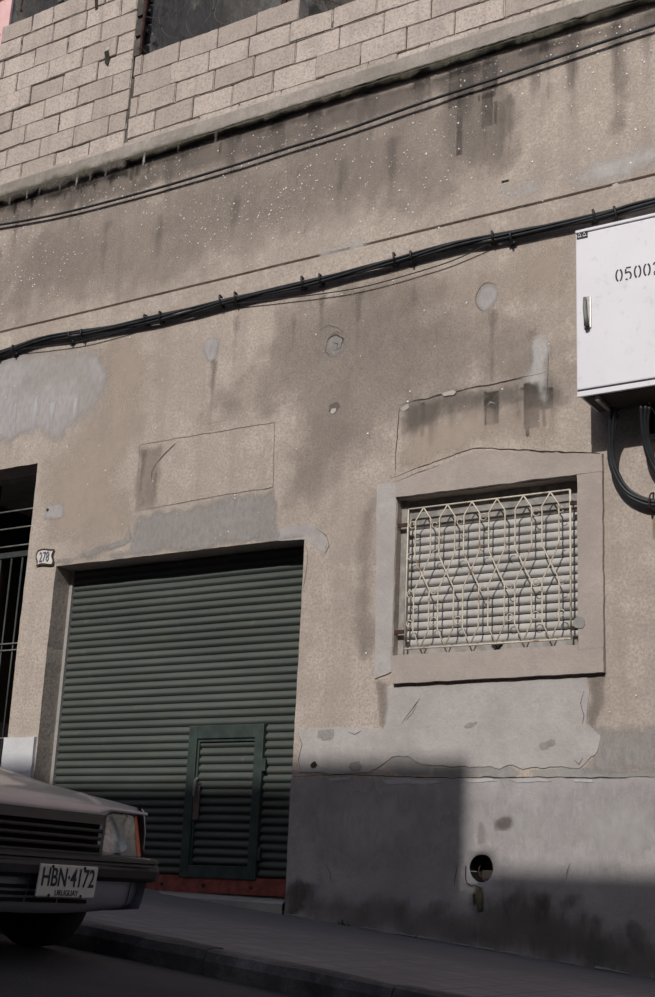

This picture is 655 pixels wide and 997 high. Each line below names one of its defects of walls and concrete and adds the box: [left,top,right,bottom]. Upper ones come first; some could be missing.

crack [297,772,653,780]